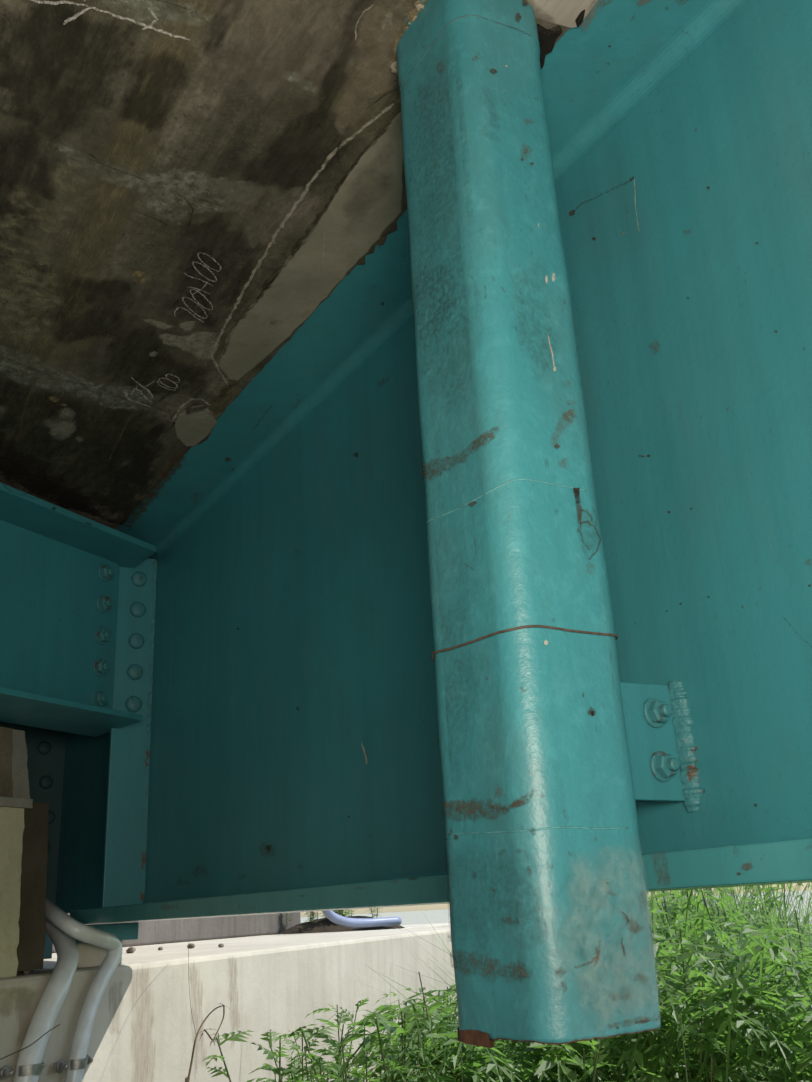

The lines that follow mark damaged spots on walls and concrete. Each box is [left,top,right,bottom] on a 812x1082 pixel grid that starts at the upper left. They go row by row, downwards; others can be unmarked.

leakage [0,0,363,524]
crack [90,122,393,354]